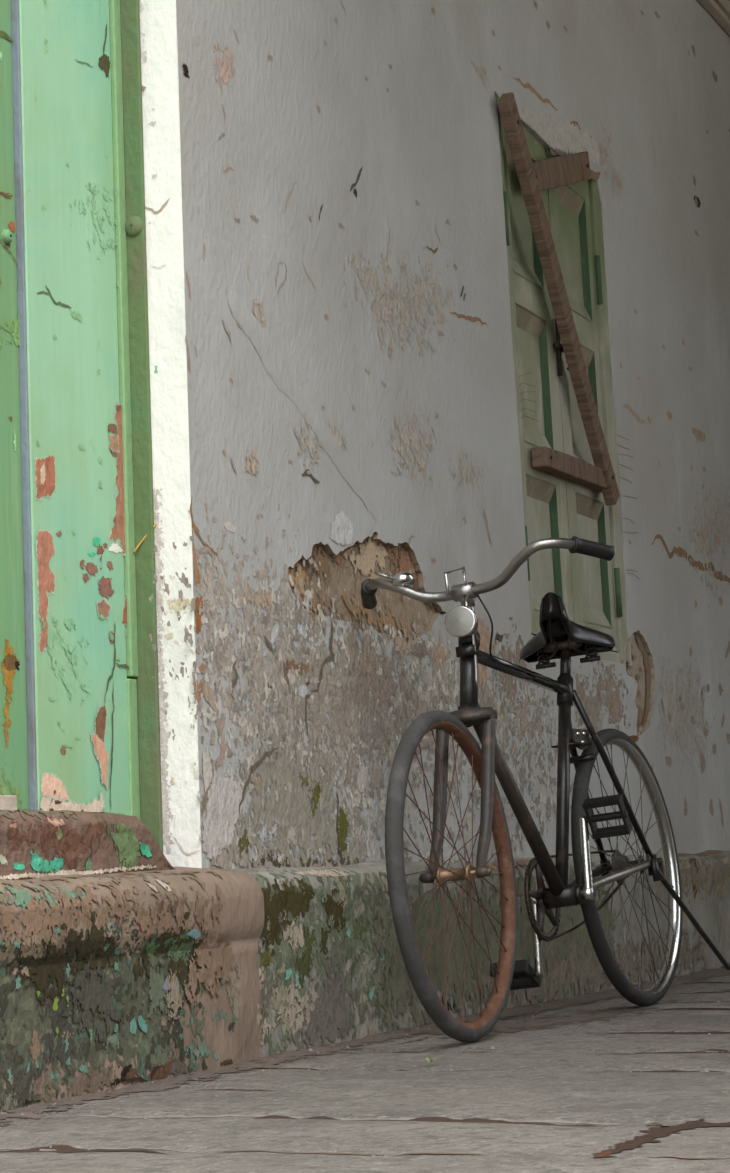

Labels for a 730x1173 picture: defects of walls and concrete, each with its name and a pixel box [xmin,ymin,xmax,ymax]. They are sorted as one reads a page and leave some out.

spalling [288,532,446,655]
crack [651,534,730,584]
spalling [194,663,233,703]
spalling [286,657,342,706]
spalling [621,630,655,742]
spalling [190,752,213,792]
damp [289,956,357,1049]
damp [30,1029,53,1103]